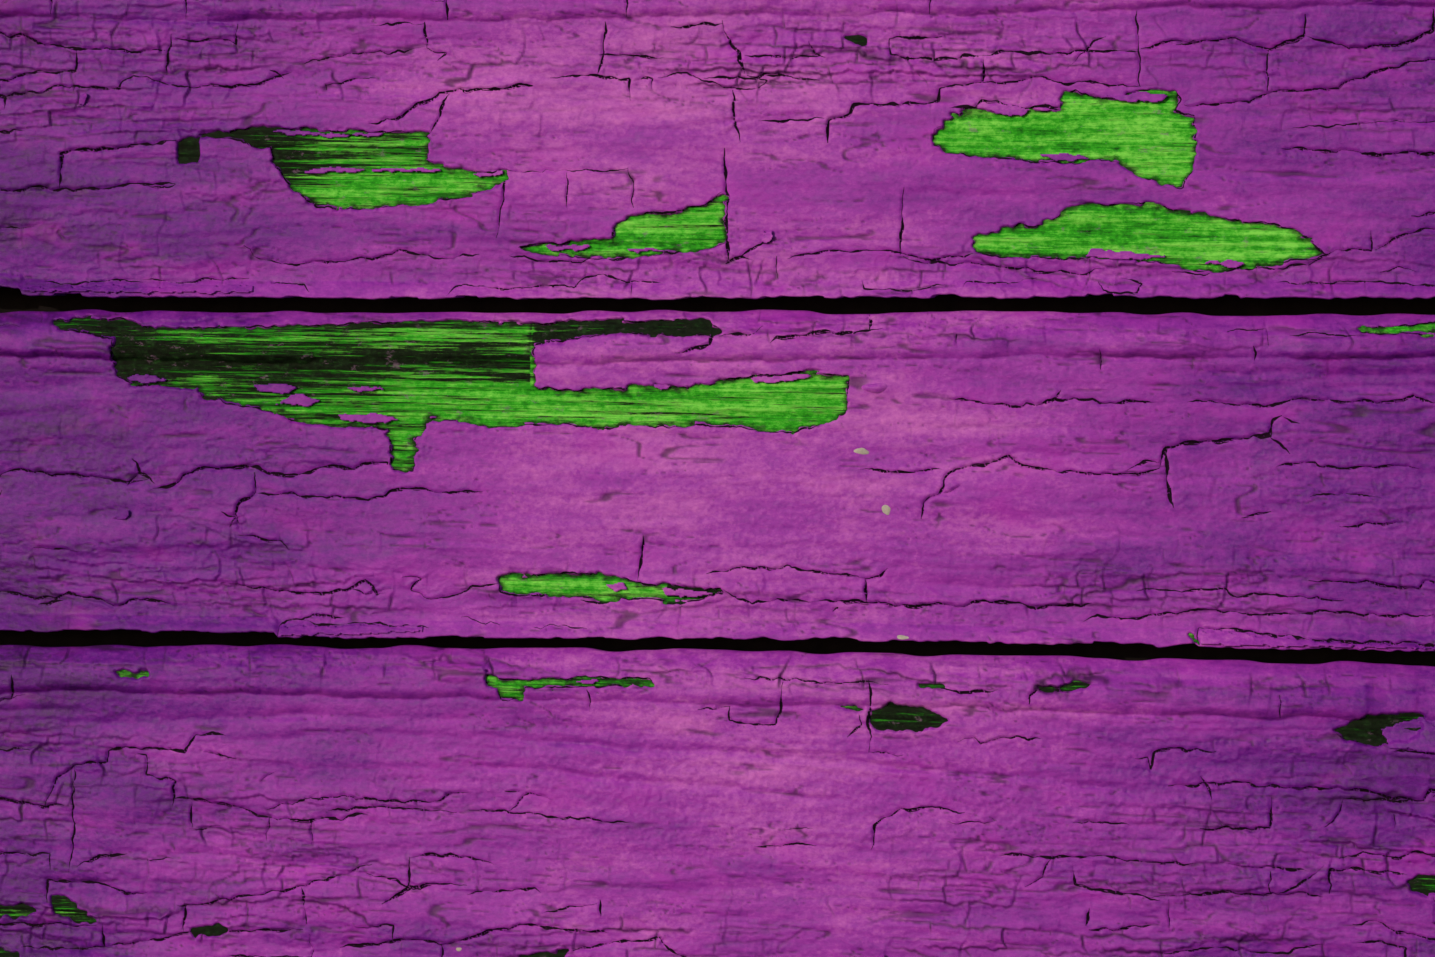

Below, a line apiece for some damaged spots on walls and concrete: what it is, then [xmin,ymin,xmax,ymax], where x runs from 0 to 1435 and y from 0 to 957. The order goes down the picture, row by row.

peeling [178,126,509,211]
peeling [518,192,729,259]
crack [0,0,1435,353]
peeling [932,89,1198,189]
peeling [973,202,1326,273]
peeling [53,315,850,473]
crack [0,458,482,550]
crack [858,395,1434,528]
peeling [498,571,723,605]
crack [706,565,1435,647]
crack [0,731,686,957]
crack [1004,747,1435,957]